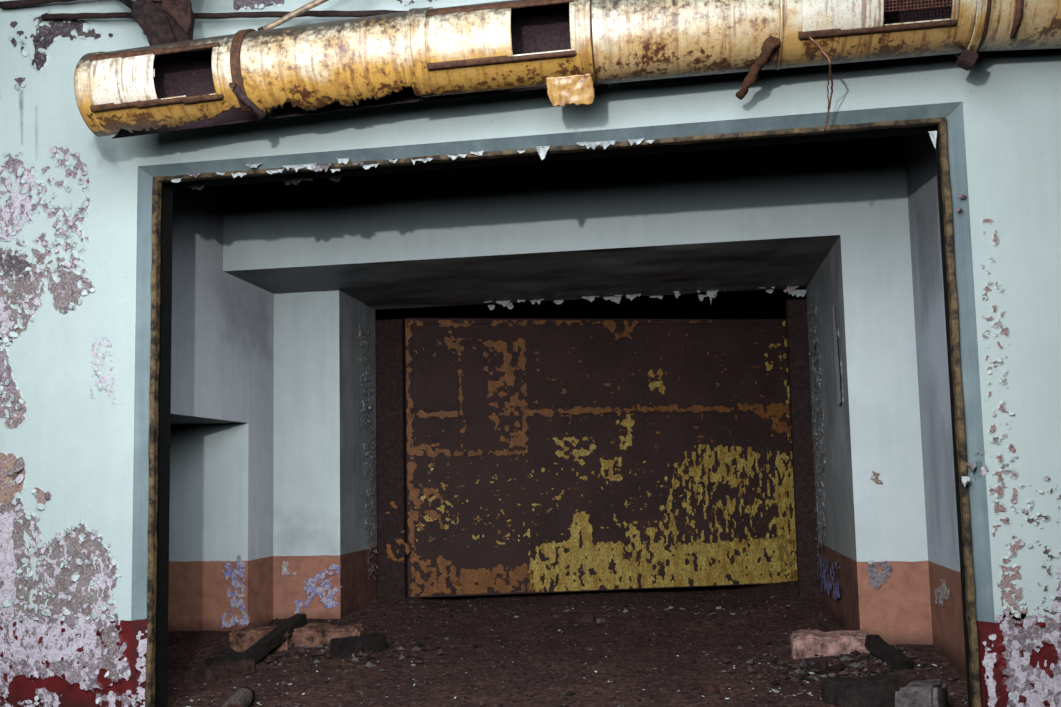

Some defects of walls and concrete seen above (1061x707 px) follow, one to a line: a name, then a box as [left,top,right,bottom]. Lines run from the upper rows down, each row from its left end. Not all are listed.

flaking render [9,10,113,91]
peeling [447,151,484,160]
peeling [517,146,550,160]
peeling [577,138,655,150]
peeling [216,158,398,186]
peeling [0,146,95,430]
peeling [484,299,564,310]
peeling [582,291,681,304]
peeling [697,289,726,304]
peeling [961,217,1061,707]
peeling [0,450,147,707]
peeling [220,554,250,629]